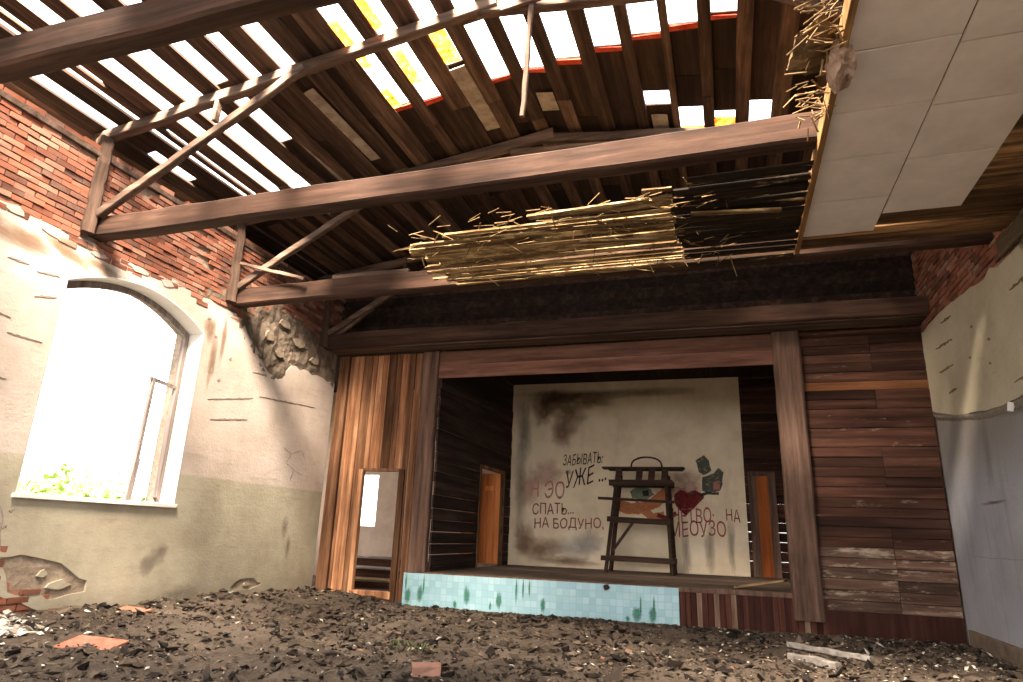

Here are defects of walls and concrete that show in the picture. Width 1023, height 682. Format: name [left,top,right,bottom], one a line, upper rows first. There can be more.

flaking render [0,84,346,388]
damp [539,397,601,440]
spalling [0,546,86,614]